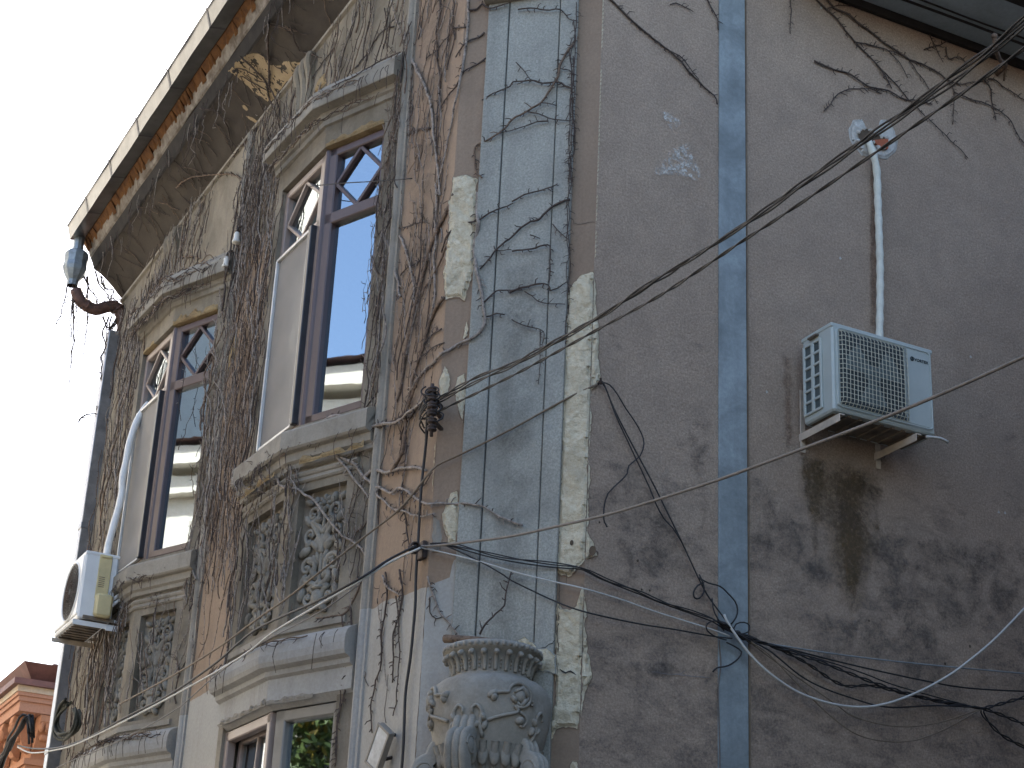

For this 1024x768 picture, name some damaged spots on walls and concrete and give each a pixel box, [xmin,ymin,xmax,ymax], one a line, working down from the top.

flaking render [228,53,300,102]
flaking render [442,174,479,302]
flaking render [438,365,466,422]
flaking render [517,271,602,738]